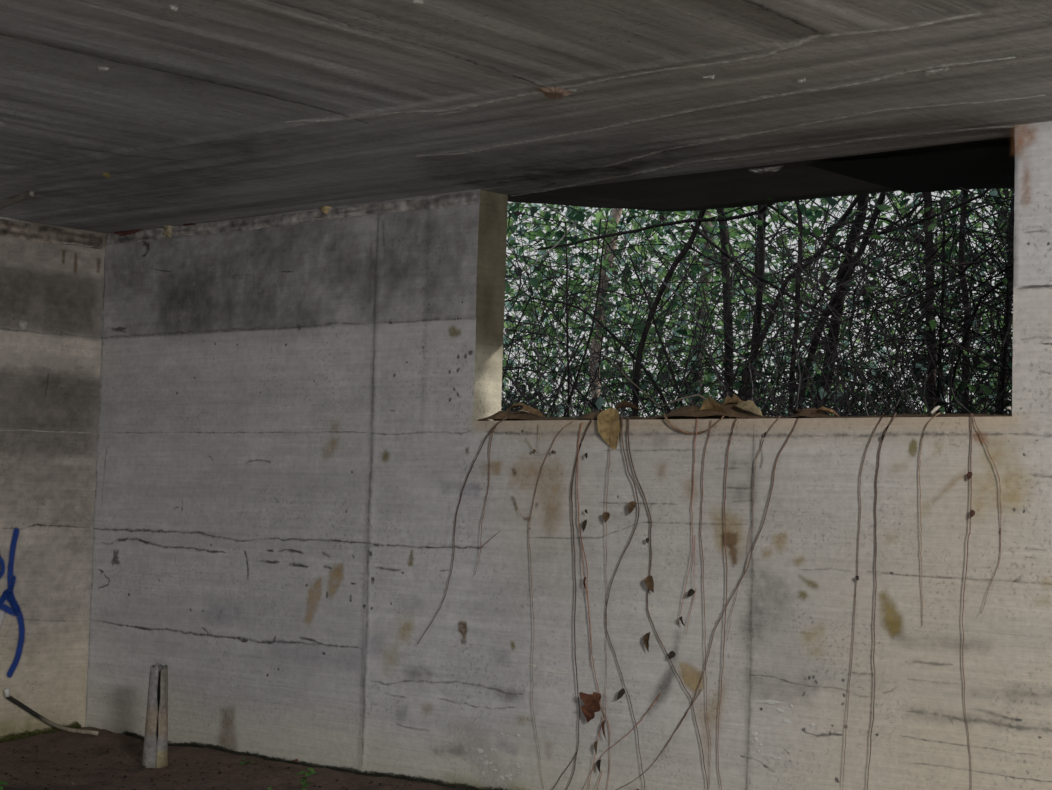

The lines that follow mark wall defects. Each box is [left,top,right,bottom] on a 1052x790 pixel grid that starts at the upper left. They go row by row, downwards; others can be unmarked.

crack [176,0,980,123]
crack [416,58,1012,157]
crack [497,95,1046,196]
rust [722,522,737,563]